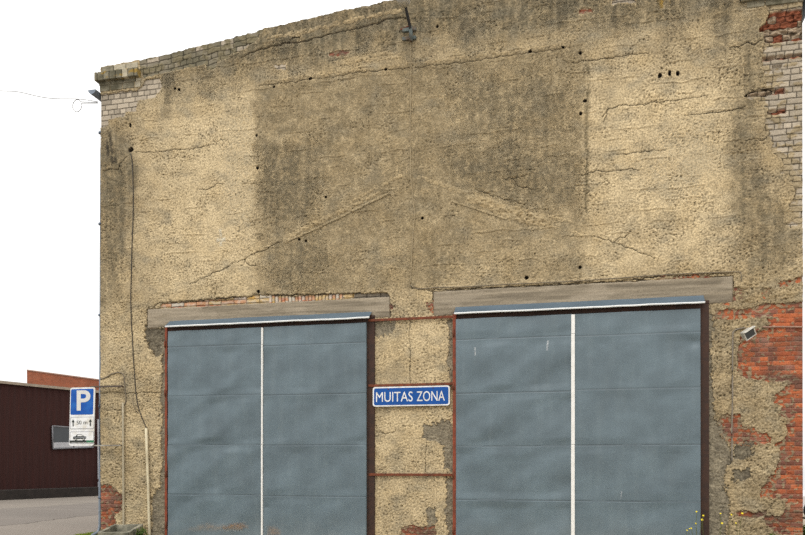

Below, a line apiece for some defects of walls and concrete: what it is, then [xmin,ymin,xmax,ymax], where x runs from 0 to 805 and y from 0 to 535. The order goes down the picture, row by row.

flaking render [101,29,263,128]
flaking render [746,1,803,228]
crack [155,240,345,306]
flaking render [709,276,803,535]
flaking render [101,482,122,531]
flaking render [400,419,453,535]